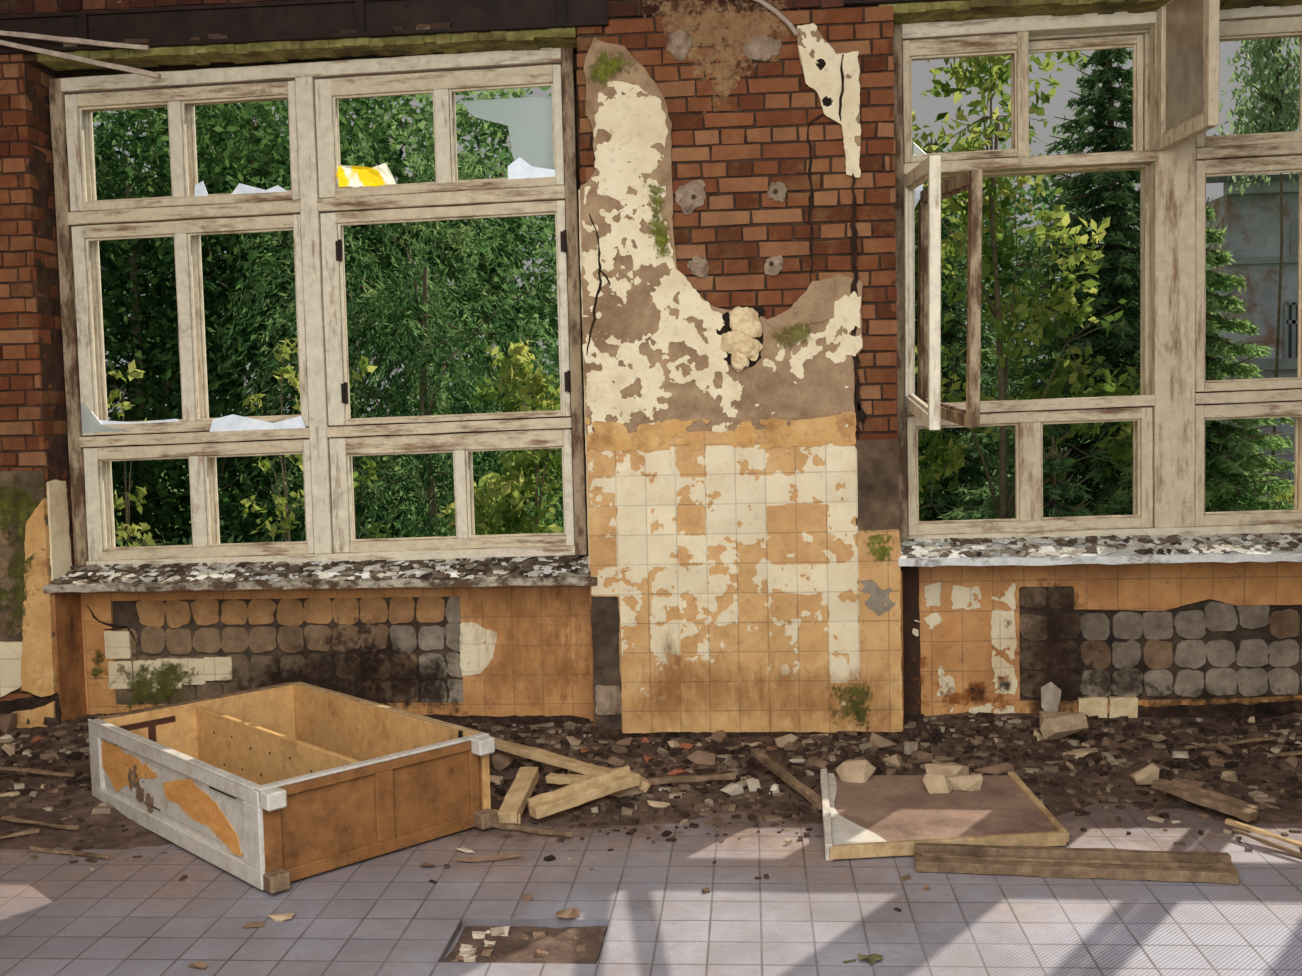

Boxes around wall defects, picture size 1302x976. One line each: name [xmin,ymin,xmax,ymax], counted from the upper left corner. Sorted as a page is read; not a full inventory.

flaking render [0,94,47,466]
flaking render [108,6,904,739]
peeling [0,529,22,637]
flaking render [0,693,62,727]
peeling [912,582,1302,719]